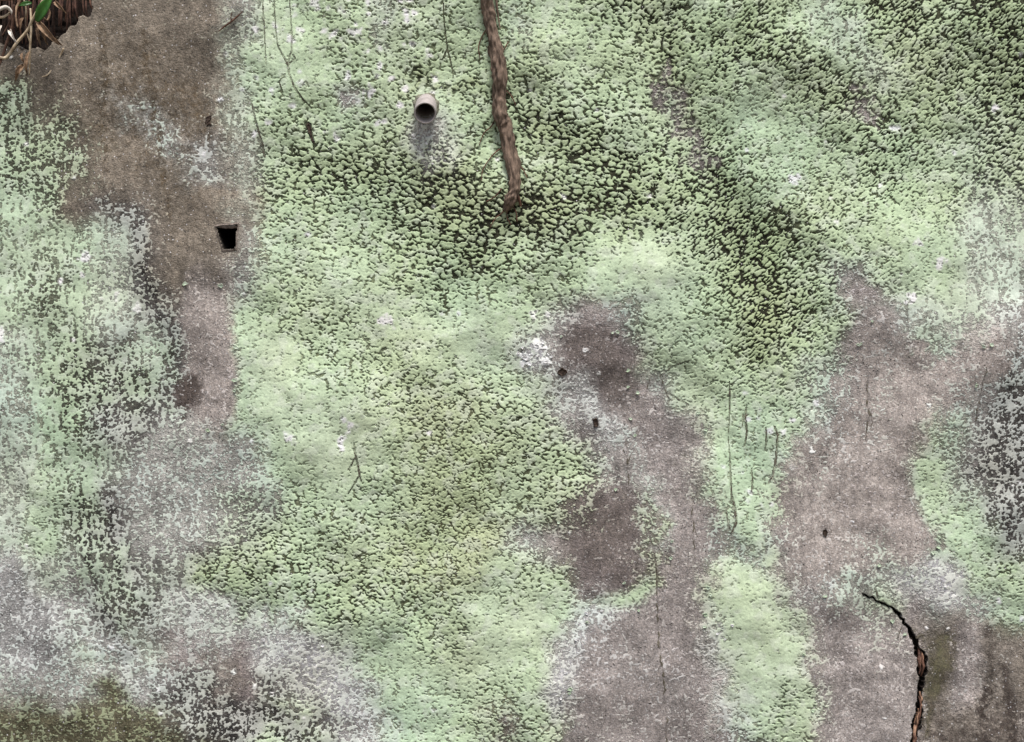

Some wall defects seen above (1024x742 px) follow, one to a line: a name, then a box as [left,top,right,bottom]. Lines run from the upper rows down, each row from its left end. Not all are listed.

crack [863,588,949,742]